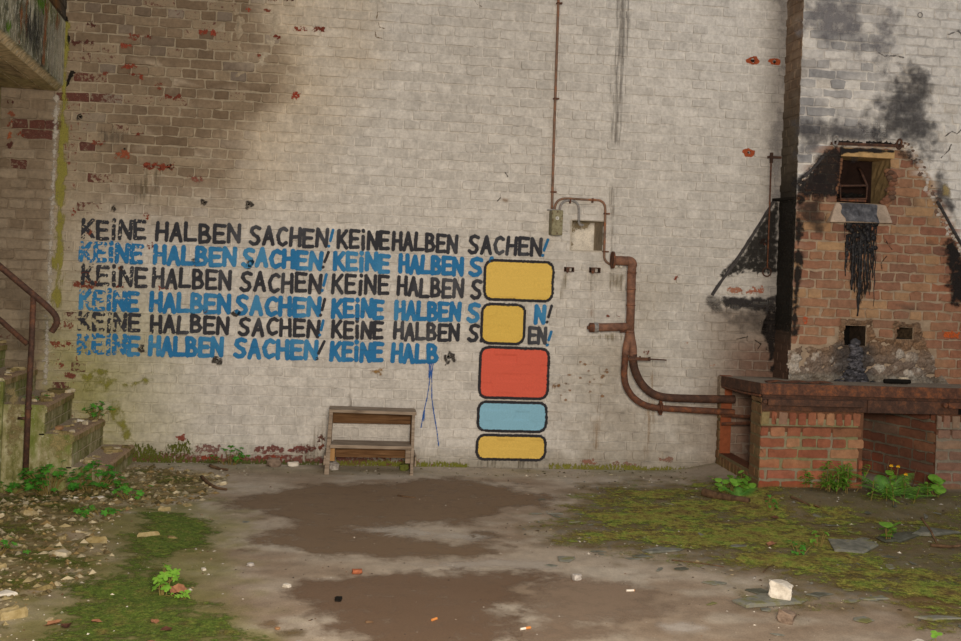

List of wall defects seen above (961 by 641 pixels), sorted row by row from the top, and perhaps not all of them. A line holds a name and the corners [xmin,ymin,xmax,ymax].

leakage [47,95,60,303]
peeling [143,162,174,172]
spalling [786,319,948,384]